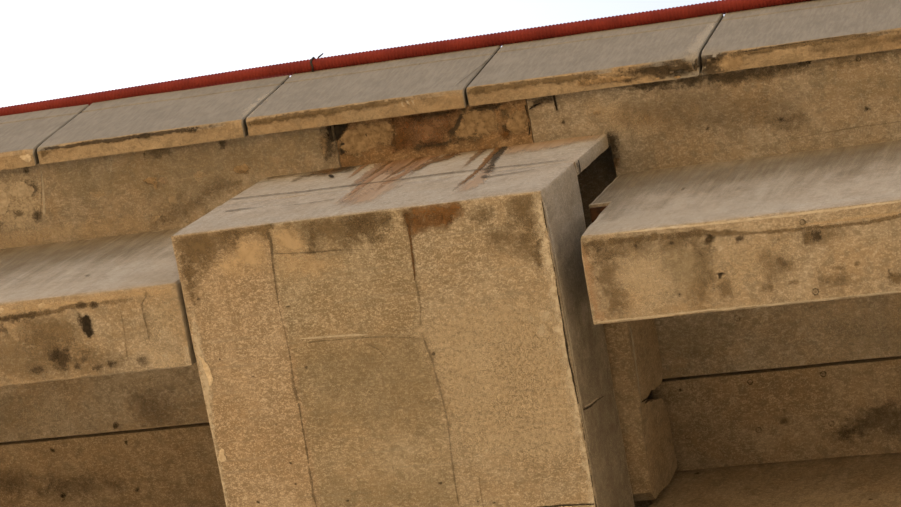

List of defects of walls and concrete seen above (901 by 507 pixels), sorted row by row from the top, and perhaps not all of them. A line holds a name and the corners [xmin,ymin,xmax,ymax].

rust [342,110,463,203]
rust [460,147,502,190]
leakage [0,301,107,337]
leakage [48,348,80,370]
spalling [534,199,595,507]
crack [541,199,604,507]